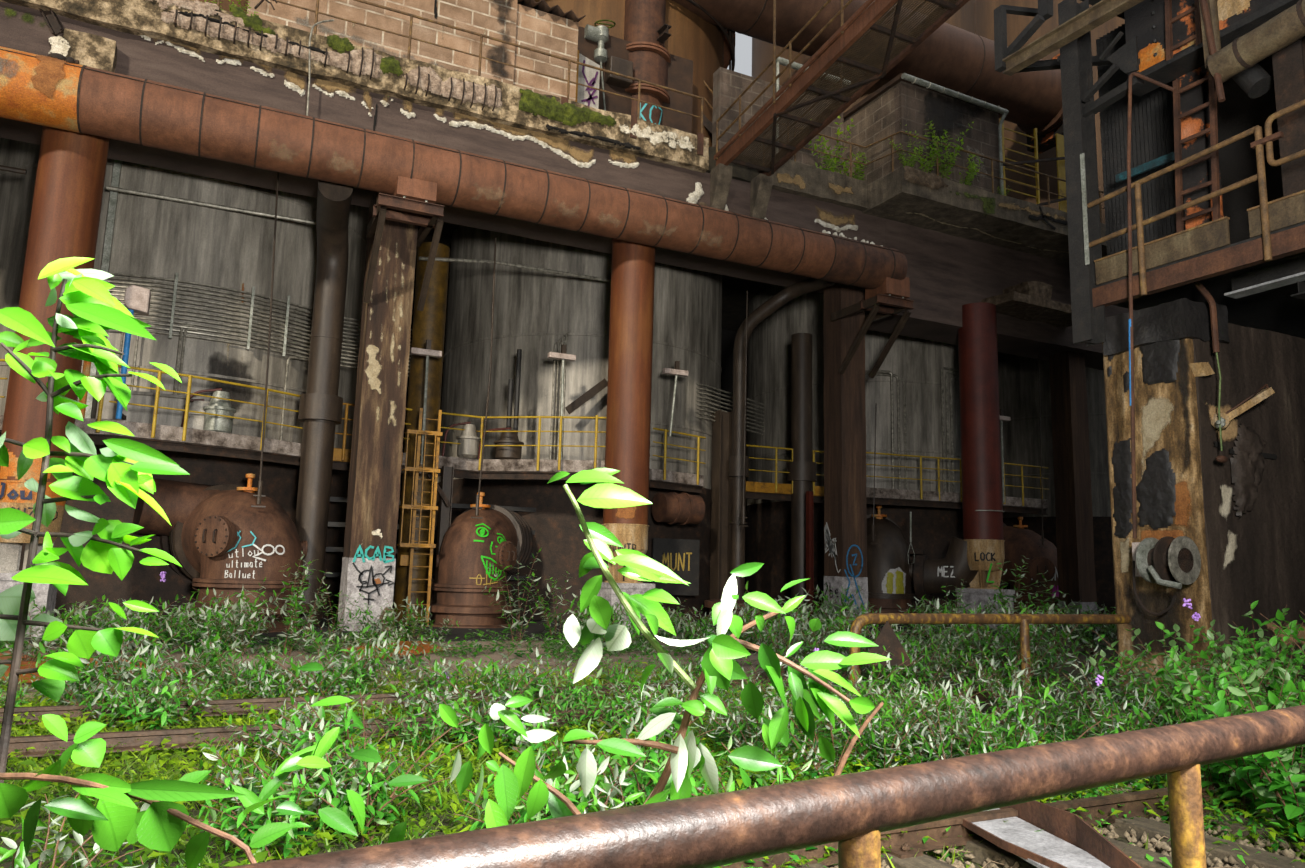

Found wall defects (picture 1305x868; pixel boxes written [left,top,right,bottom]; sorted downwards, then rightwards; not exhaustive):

rust [31,55,66,98]
peeling [365,345,396,426]
peeling [1141,398,1173,464]
rust [0,449,51,481]
rust [616,506,637,519]
peeling [1120,538,1130,572]
rust [0,651,53,683]